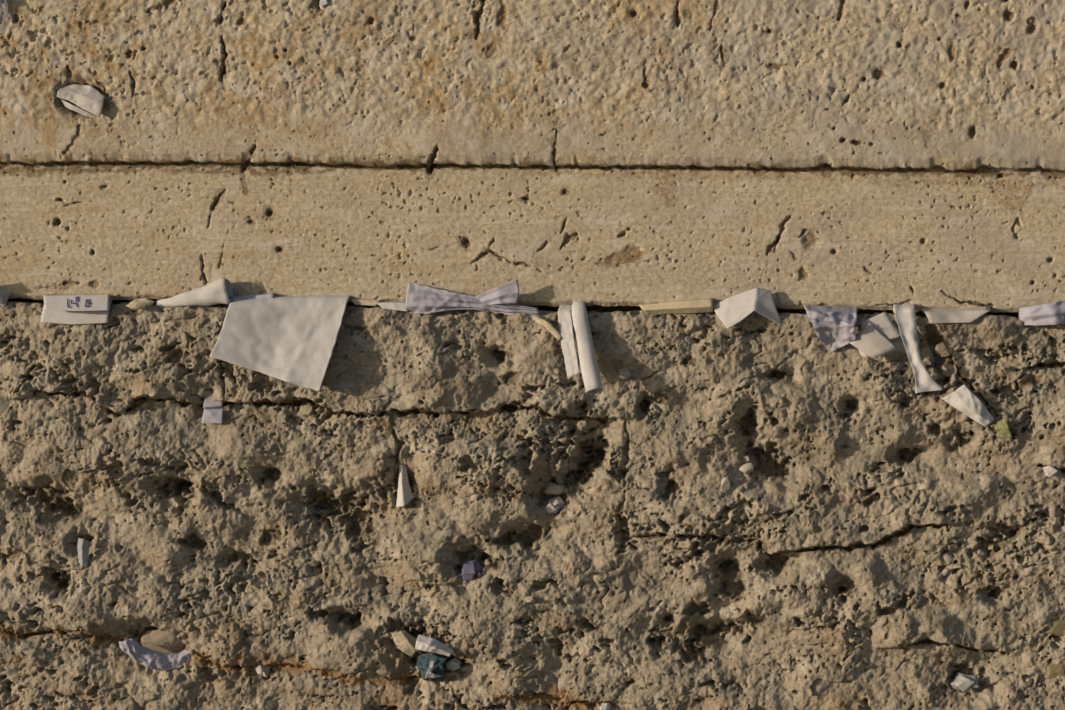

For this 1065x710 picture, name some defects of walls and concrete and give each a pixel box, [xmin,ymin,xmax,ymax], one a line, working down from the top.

crack [14,360,476,463]
crack [501,401,944,557]
crack [988,513,1044,557]
corrosion [0,621,125,647]
corrosion [185,647,424,686]